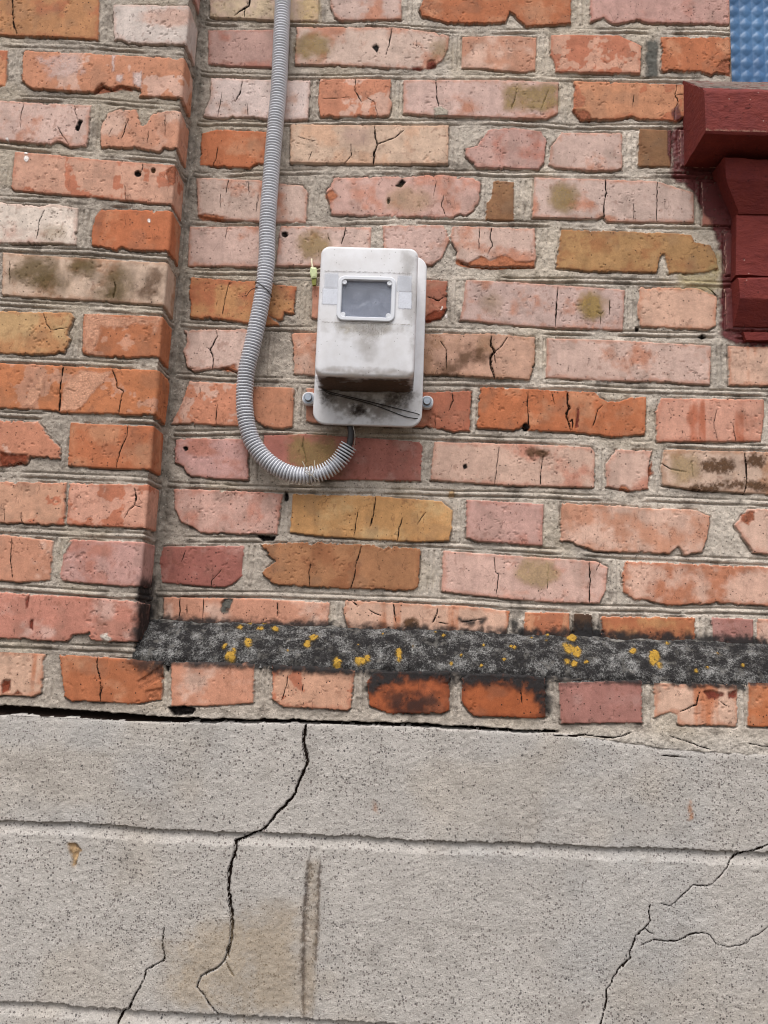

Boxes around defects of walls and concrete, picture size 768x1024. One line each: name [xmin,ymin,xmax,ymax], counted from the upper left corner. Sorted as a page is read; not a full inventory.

crack [323,80,404,165]
crack [489,337,507,379]
crack [527,393,601,431]
spalling [0,451,28,467]
crack [662,736,711,757]
crack [0,657,631,1024]
crack [600,844,768,1024]